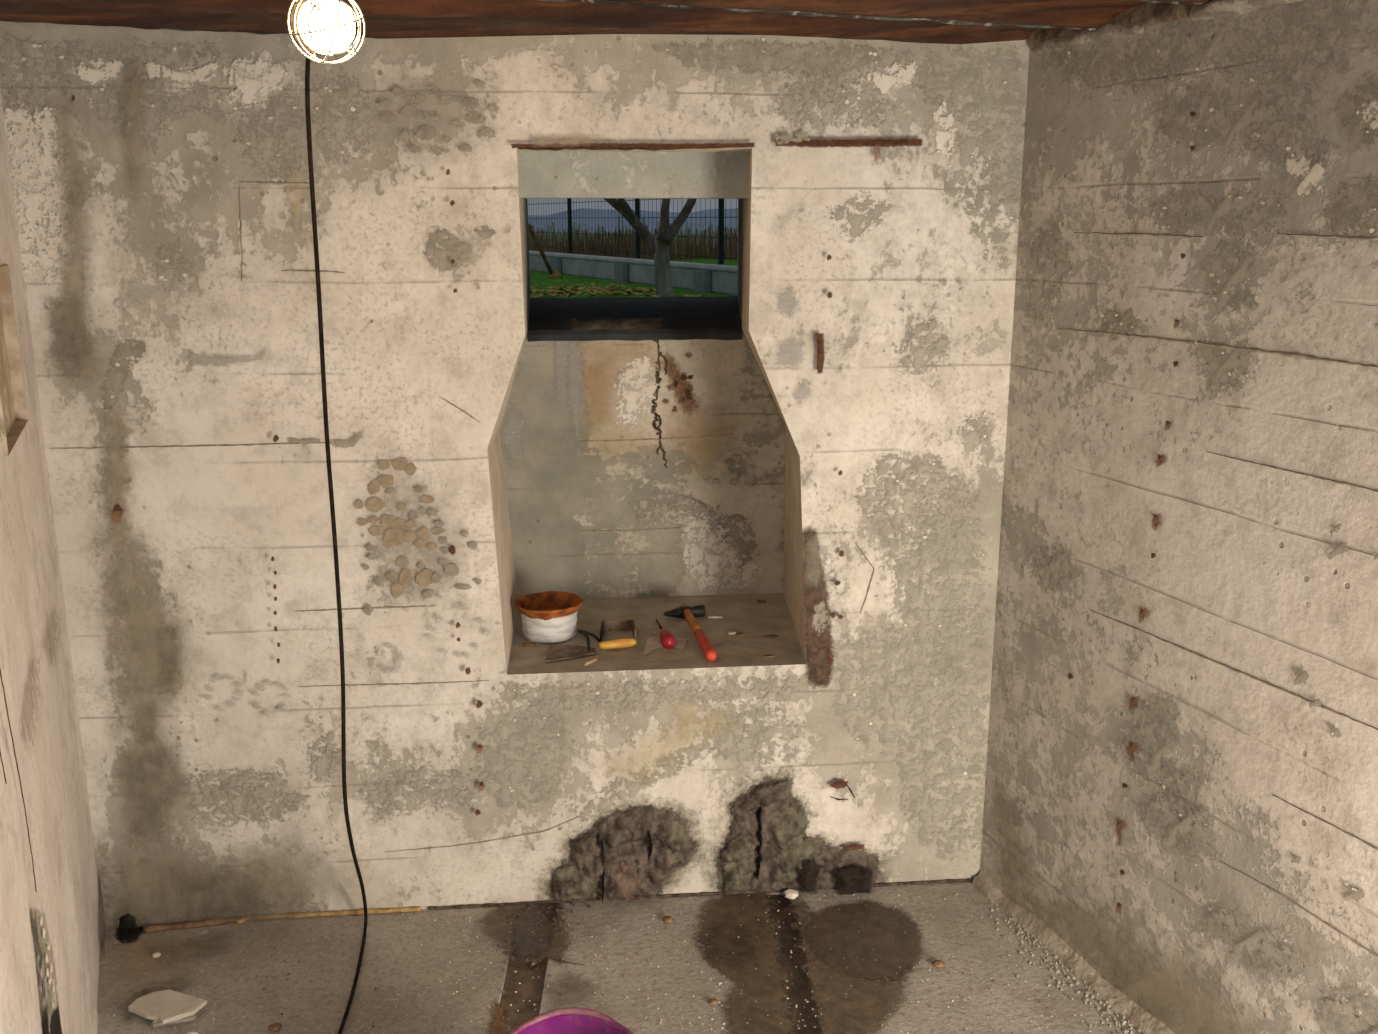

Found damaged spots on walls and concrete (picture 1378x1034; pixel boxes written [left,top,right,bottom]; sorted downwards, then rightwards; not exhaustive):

peeling [652,37,1027,269]
corrosion [775,131,923,159]
peeling [1282,154,1378,236]
peeling [1331,74,1378,155]
crack [579,340,733,468]
corrosion [663,353,698,413]
corrosion [816,333,825,374]
peeling [354,457,490,674]
damp [99,415,308,954]
spalling [357,673,887,902]
damp [480,902,594,1008]
damp [693,892,922,1034]